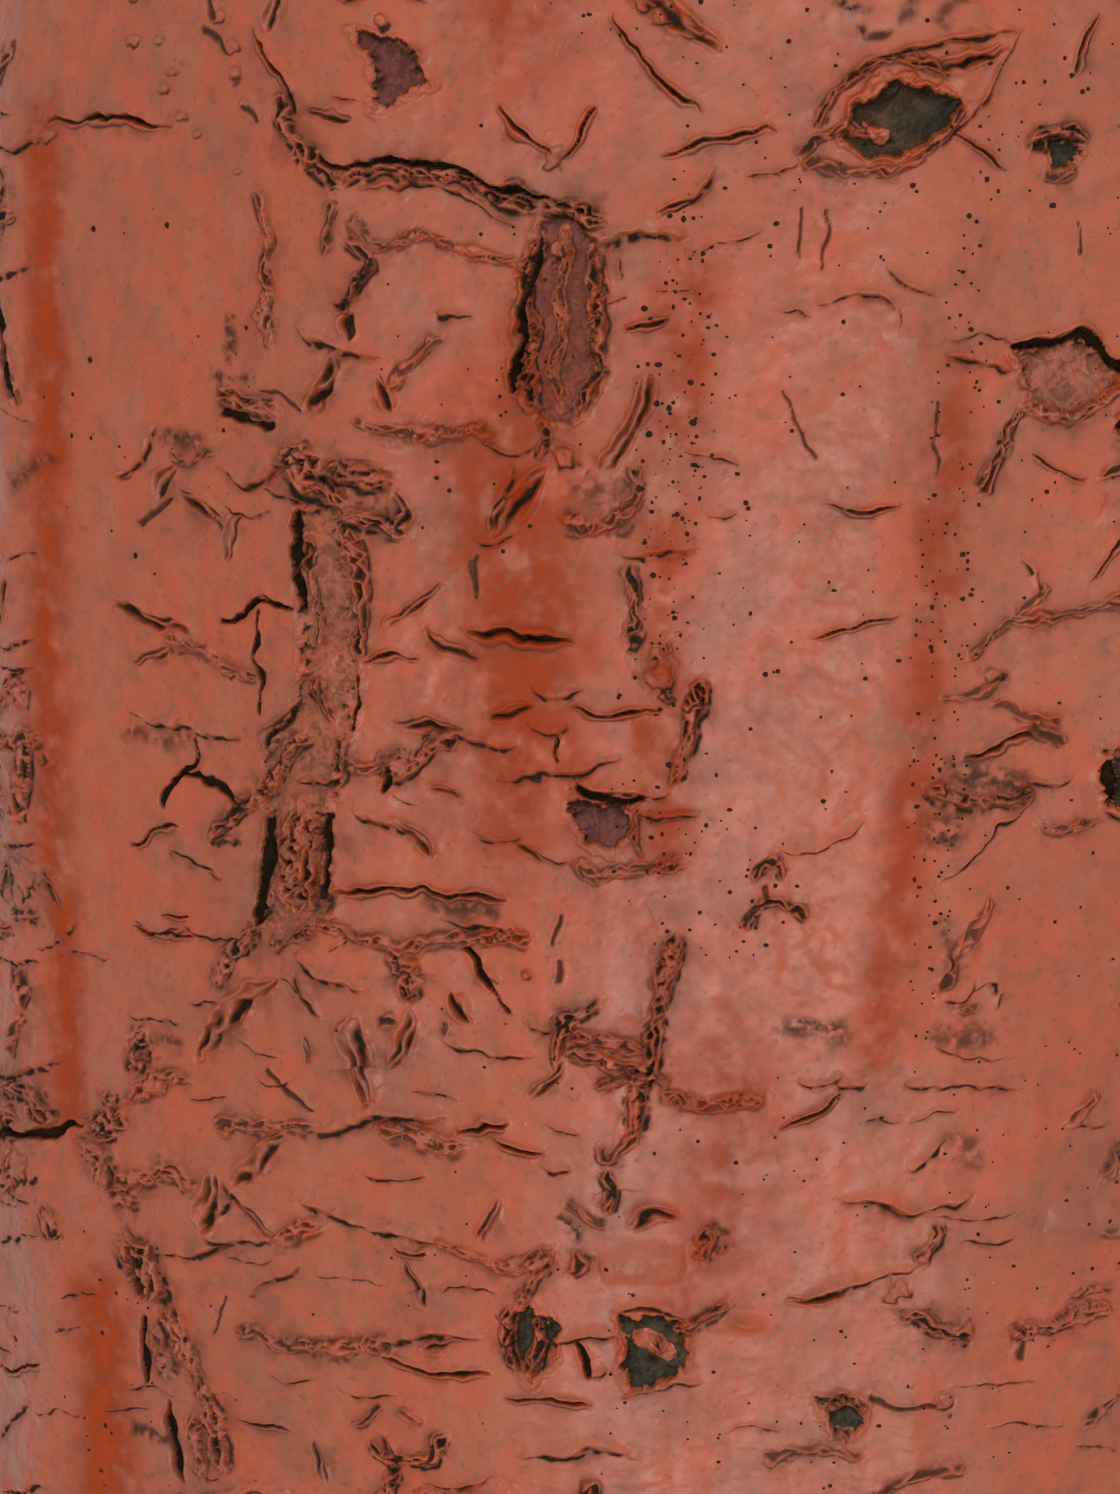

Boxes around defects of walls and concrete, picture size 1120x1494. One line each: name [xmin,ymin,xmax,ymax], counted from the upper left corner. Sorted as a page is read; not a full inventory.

peeling [333,0,451,124]
peeling [744,17,1026,193]
crack [119,0,619,553]
peeling [497,214,623,431]
peeling [1001,312,1120,439]
peeling [159,501,385,937]
peeling [559,669,722,861]
crack [733,846,819,934]
crack [370,911,702,1312]
peeling [430,1220,570,1394]
crack [553,1322,618,1383]
peeling [607,1292,706,1406]